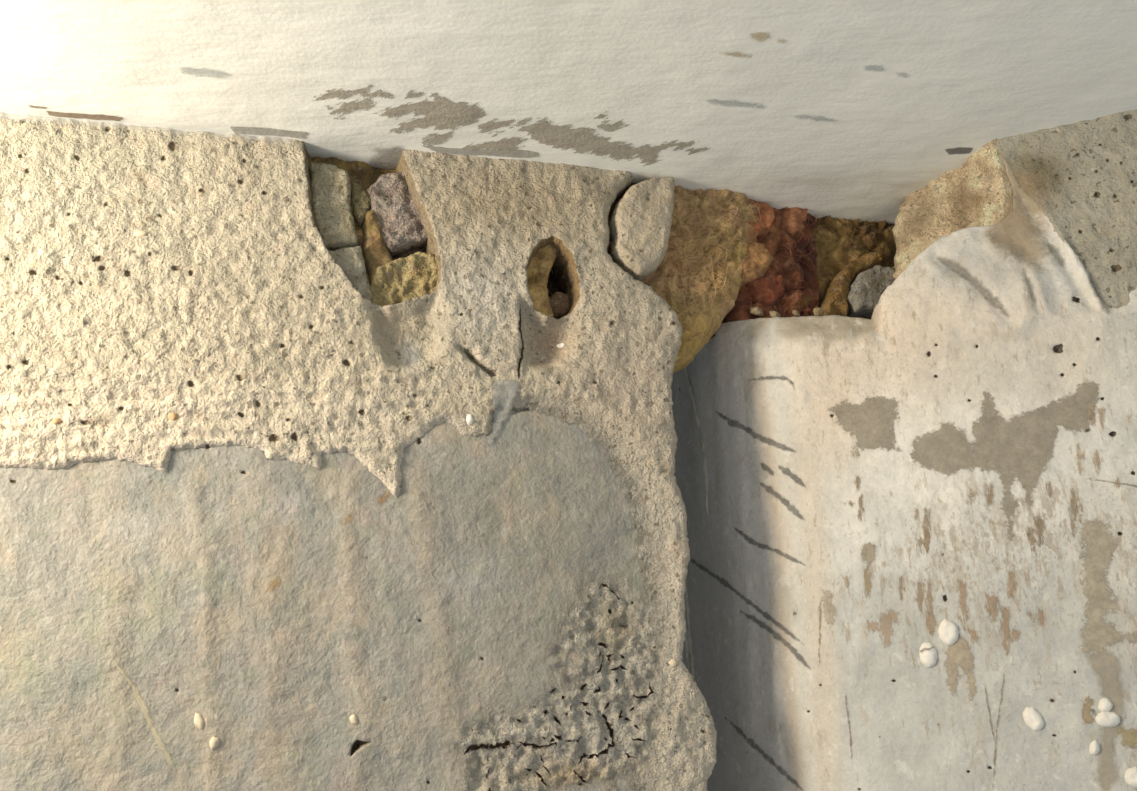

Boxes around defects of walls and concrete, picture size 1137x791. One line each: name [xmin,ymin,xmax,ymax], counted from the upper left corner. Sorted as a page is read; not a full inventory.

spalling [891,109,1137,308]
spalling [0,85,717,791]
crack [517,305,525,379]
damp [828,382,1099,540]
crack [464,583,654,791]
damp [944,636,976,701]